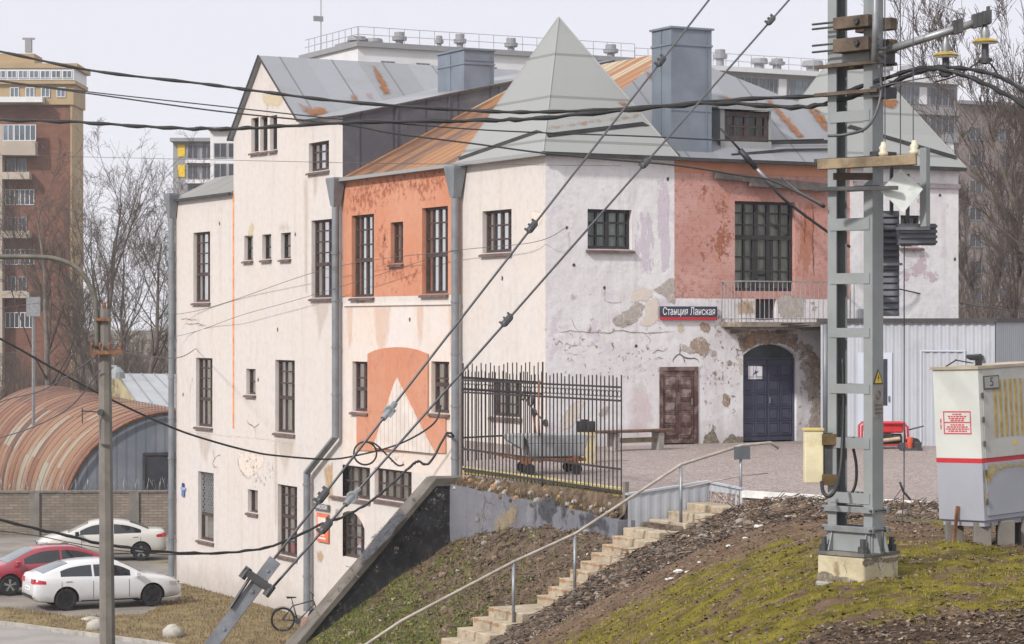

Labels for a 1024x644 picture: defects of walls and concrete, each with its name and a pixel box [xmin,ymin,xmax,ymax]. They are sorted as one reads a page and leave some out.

corrosion [373,66,390,93]
corrosion [301,105,326,115]
corrosion [764,100,804,136]
corrosion [809,109,828,130]
spalling [553,177,821,444]
crack [562,320,699,362]
flaking render [238,451,266,487]